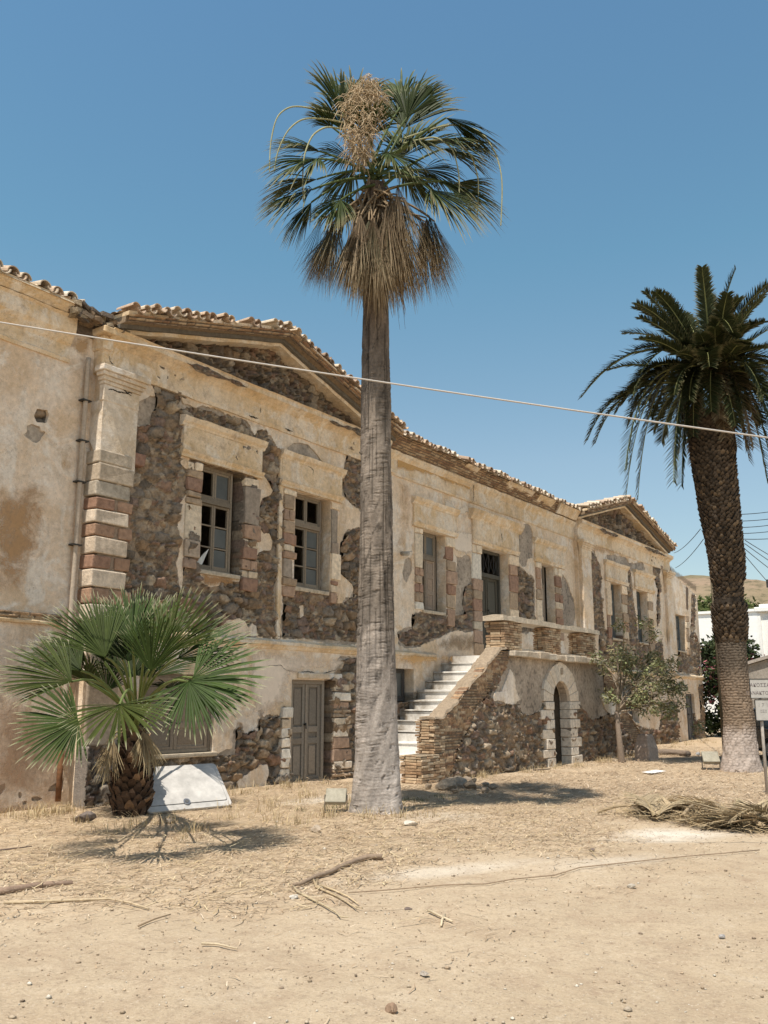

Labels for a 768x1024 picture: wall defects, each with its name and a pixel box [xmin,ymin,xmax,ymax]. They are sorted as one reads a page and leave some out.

flaking render [137,385,156,427]
flaking render [24,409,46,443]
flaking render [256,477,273,504]
water stain [0,490,39,583]
flaking render [175,495,186,588]
flaking render [257,530,272,555]
flaking render [323,575,353,603]
flaking render [201,581,357,681]
flaking render [236,764,269,788]